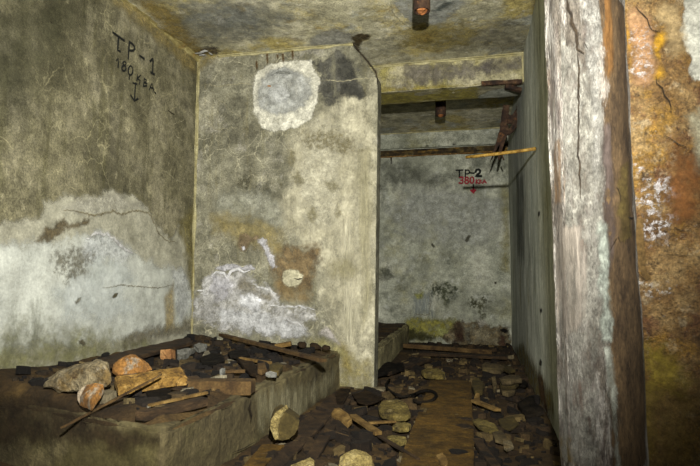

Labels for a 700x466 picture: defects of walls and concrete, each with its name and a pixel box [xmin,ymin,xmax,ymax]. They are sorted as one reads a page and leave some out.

leakage [310,29,370,106]
crack [566,0,588,197]
rust [626,3,684,84]
leakage [636,177,674,241]
leakage [0,189,316,369]
rust [214,218,320,299]